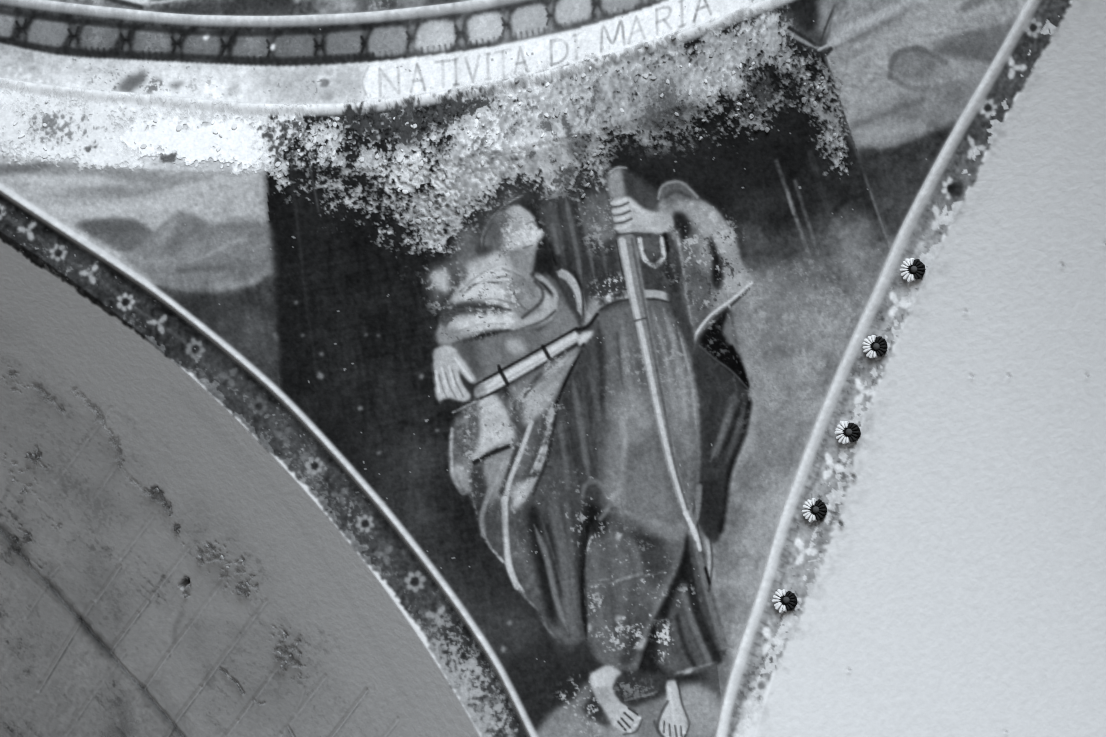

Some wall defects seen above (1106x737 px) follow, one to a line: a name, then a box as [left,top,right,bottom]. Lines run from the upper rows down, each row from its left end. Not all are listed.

peeling [0,10,848,254]
crack [1,530,179,733]